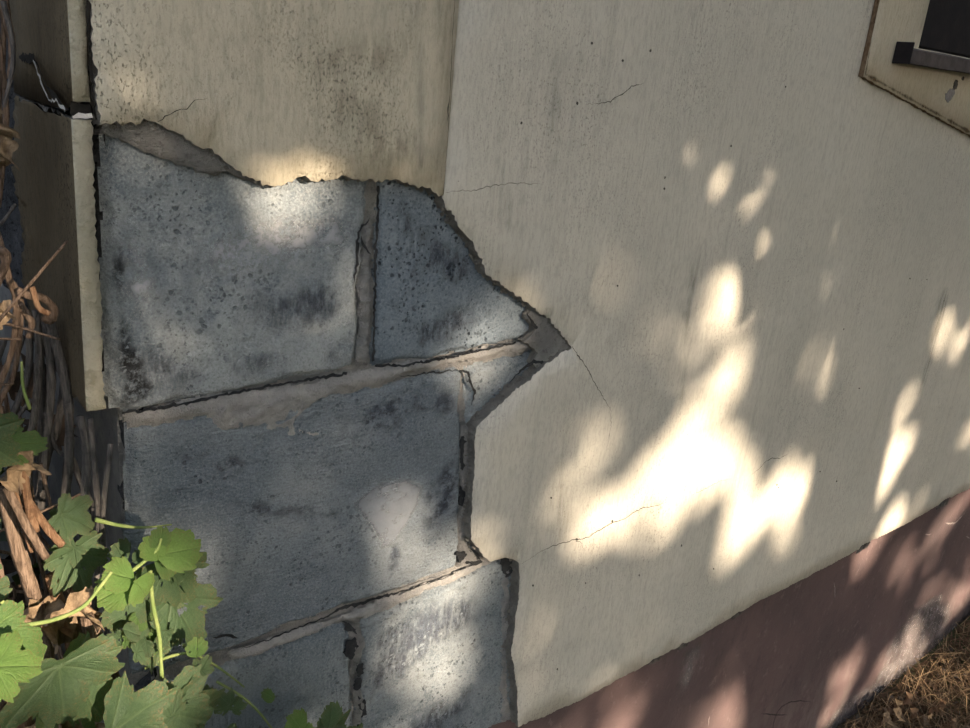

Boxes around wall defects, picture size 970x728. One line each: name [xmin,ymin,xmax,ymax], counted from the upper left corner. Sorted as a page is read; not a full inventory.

crack [445,5,538,193]
crack [122,372,347,414]
spalling [93,118,569,728]
crack [353,186,538,405]
crack [509,359,544,383]
crack [522,502,658,564]